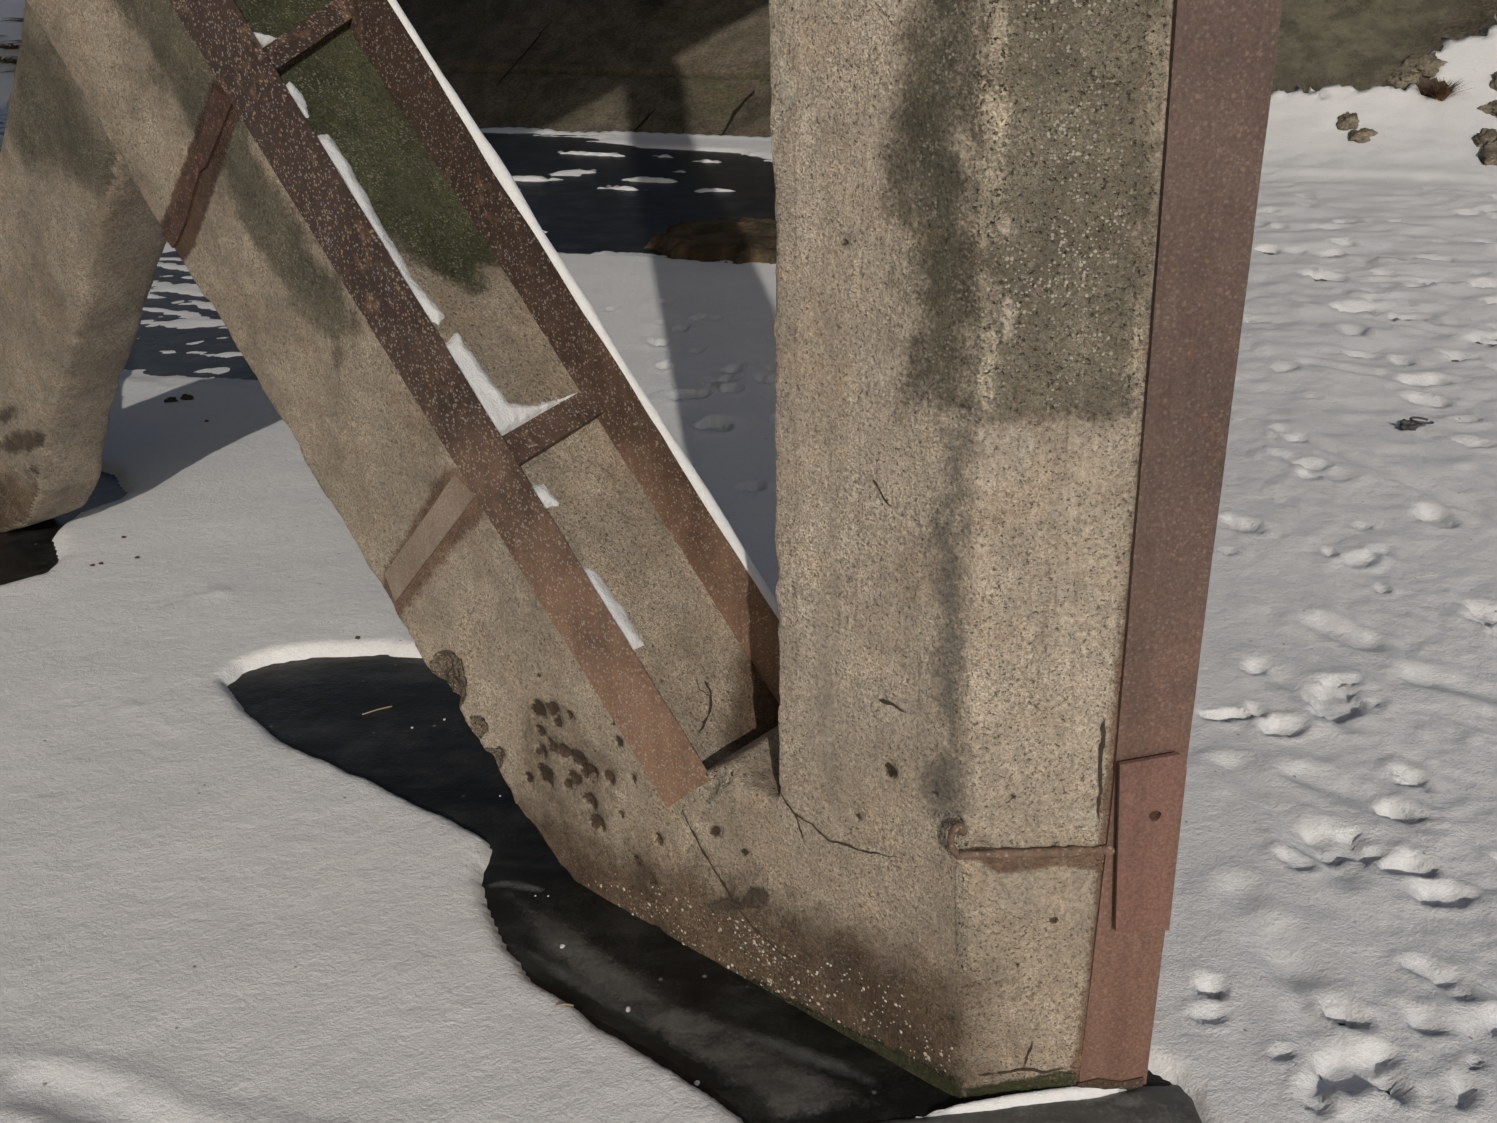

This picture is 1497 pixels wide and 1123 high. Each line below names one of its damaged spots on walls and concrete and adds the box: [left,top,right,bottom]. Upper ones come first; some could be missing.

water stain [116,0,220,132]
corrosion [161,81,238,262]
water stain [220,114,357,367]
water stain [884,0,1168,724]
corrosion [383,468,483,616]
spalling [526,699,624,831]
crack [682,810,803,966]
water stain [533,816,975,1100]
crack [780,792,901,859]
corrosion [971,592,1144,1090]